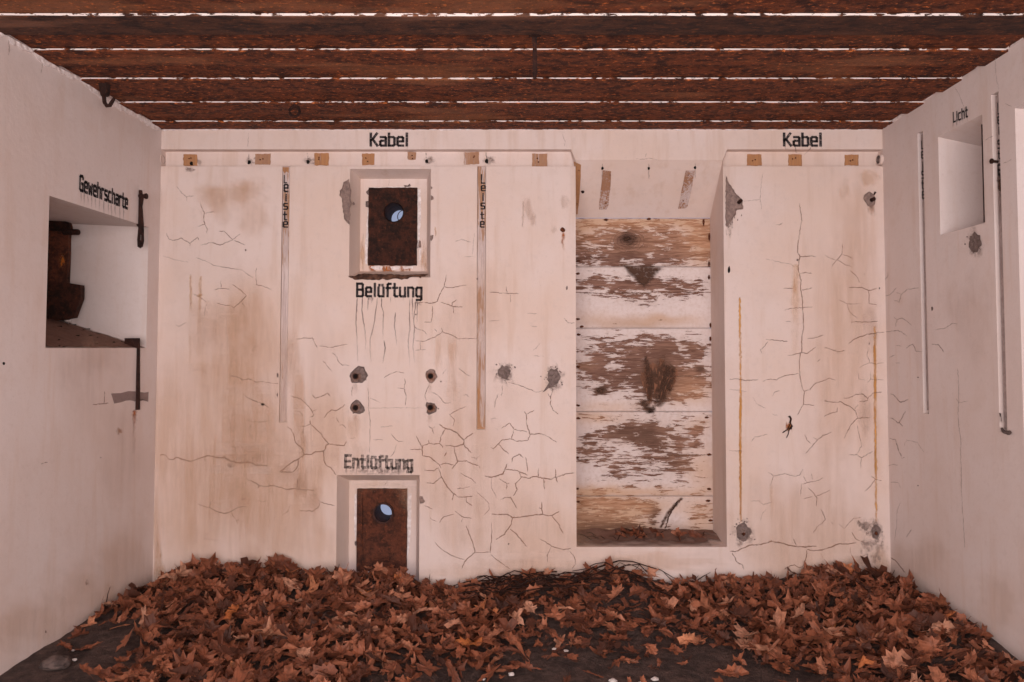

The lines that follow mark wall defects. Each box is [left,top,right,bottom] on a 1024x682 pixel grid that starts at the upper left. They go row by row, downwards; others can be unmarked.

flaking render [339,179,434,280]
flaking render [725,177,743,228]
crack [419,279,472,342]
crack [741,205,915,522]
crack [162,378,345,511]
crack [393,370,576,567]
crack [732,521,863,569]